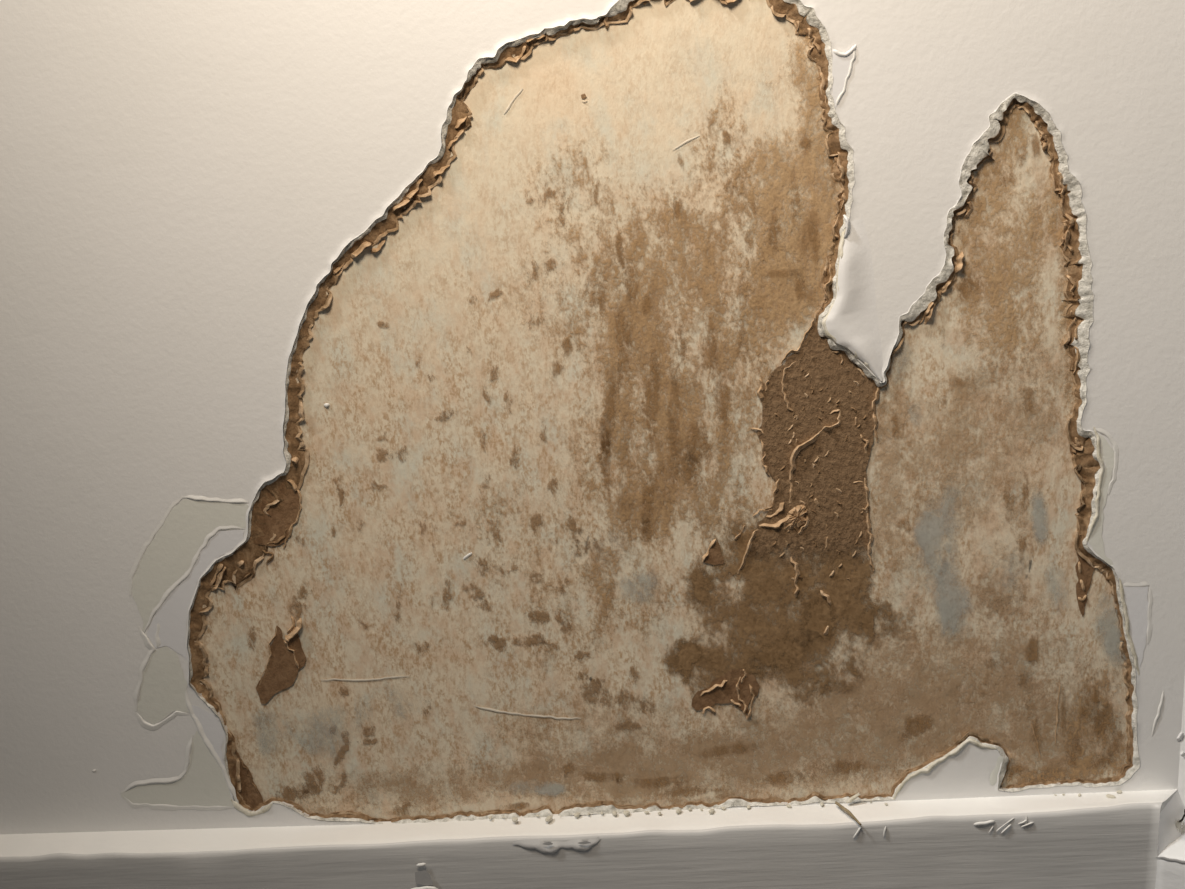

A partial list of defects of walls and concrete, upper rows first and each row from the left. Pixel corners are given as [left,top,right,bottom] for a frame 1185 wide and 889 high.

peeling [120,495,249,811]
peeling [412,863,438,889]
spalling [188,0,1153,824]
water stain [357,29,1128,815]